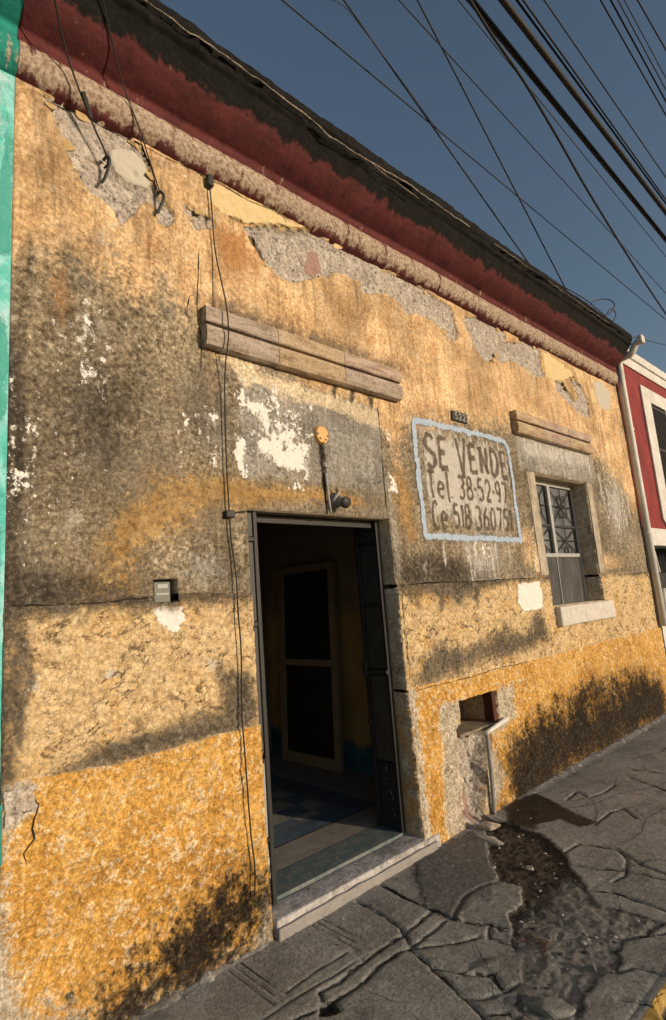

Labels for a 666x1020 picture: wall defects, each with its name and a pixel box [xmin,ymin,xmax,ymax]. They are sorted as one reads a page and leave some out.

spalling [43,96,611,417]
peeling [204,376,317,492]
spalling [3,783,38,828]
crack [4,799,39,865]
crack [549,748,666,941]
crack [296,884,521,1020]